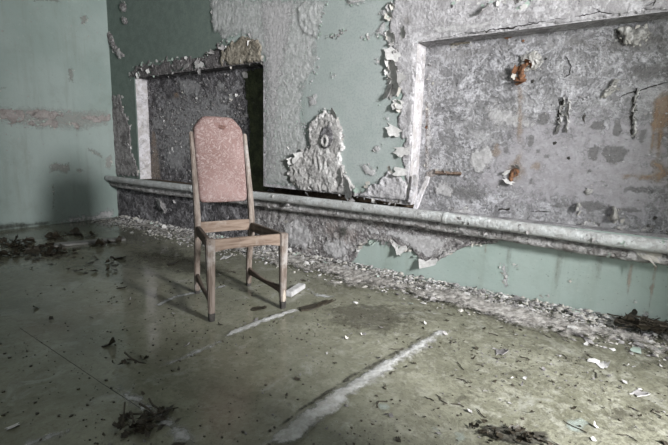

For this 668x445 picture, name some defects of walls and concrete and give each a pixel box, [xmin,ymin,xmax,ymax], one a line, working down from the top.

crack [470,11,612,34]
corrosion [511,59,532,86]
peeling [0,108,80,130]
peeling [89,94,139,178]
peeling [128,33,264,188]
flaking render [286,0,668,240]
corrosion [651,95,668,149]
corrosion [435,168,462,176]
corrosion [502,164,521,185]
flaking render [116,187,499,269]